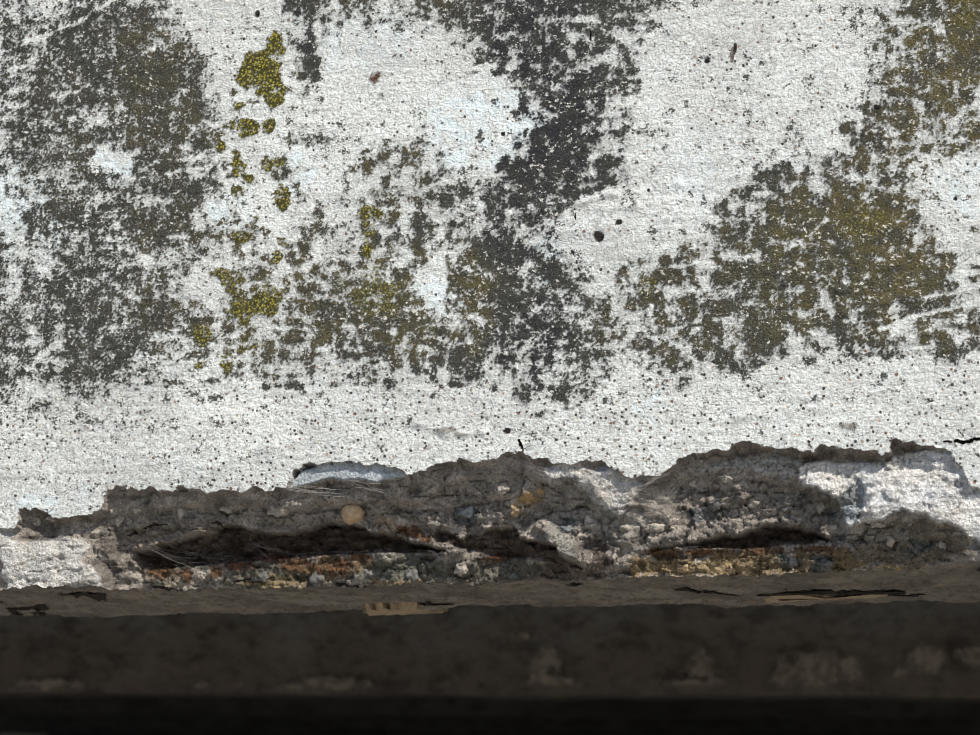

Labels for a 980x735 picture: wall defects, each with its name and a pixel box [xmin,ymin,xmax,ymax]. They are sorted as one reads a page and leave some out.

leakage [281,0,335,97]
leakage [0,0,222,415]
leakage [444,0,823,417]
crack [943,429,980,445]
rust [395,525,433,543]
spalling [0,438,980,591]
rust [644,545,840,559]